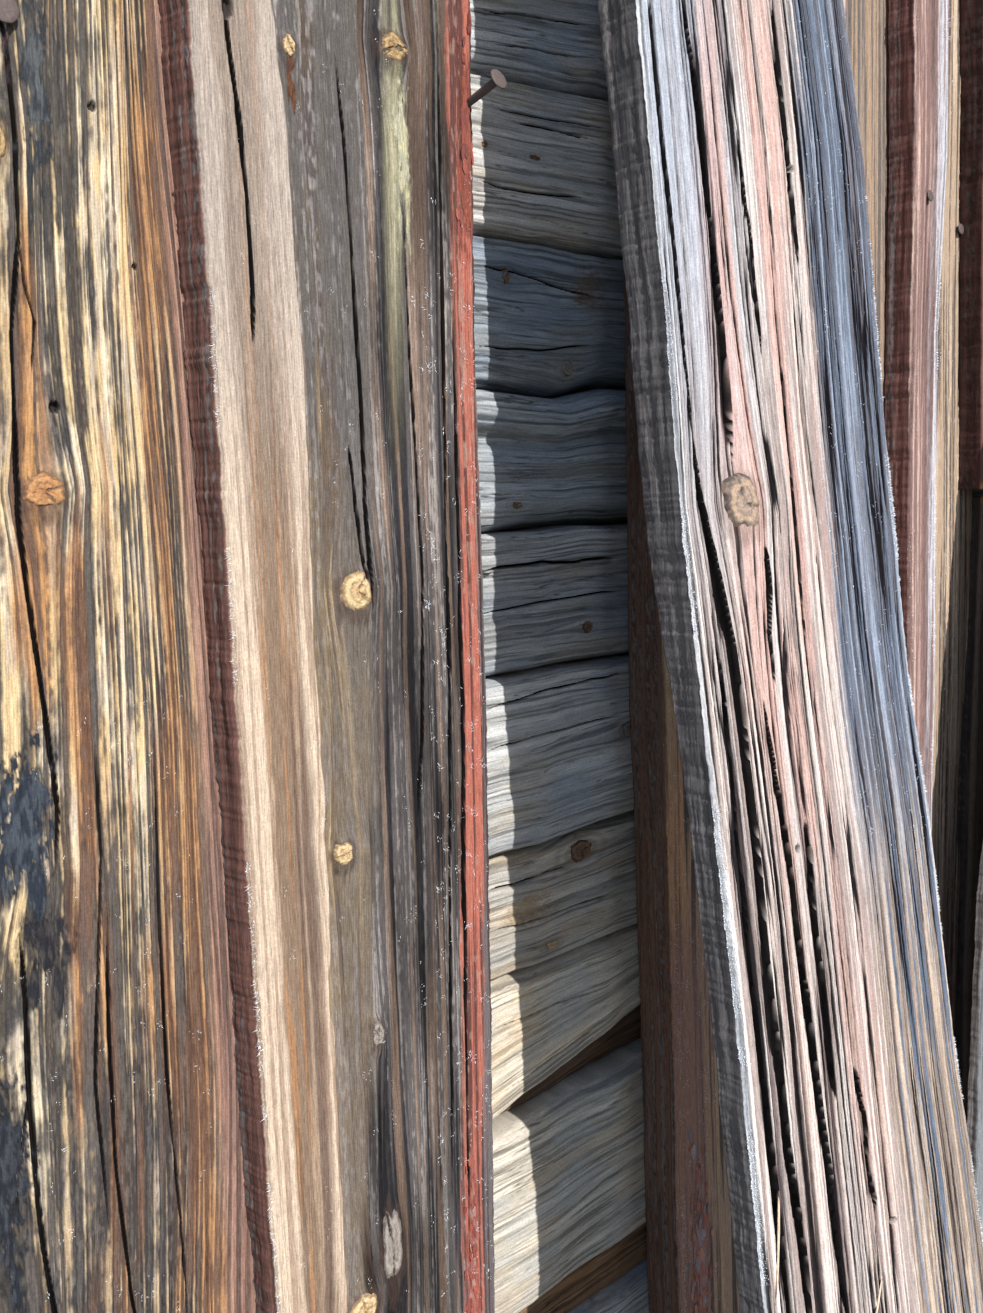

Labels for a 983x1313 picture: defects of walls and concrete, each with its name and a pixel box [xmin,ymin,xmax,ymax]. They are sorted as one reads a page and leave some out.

crack [16,937,54,1313]